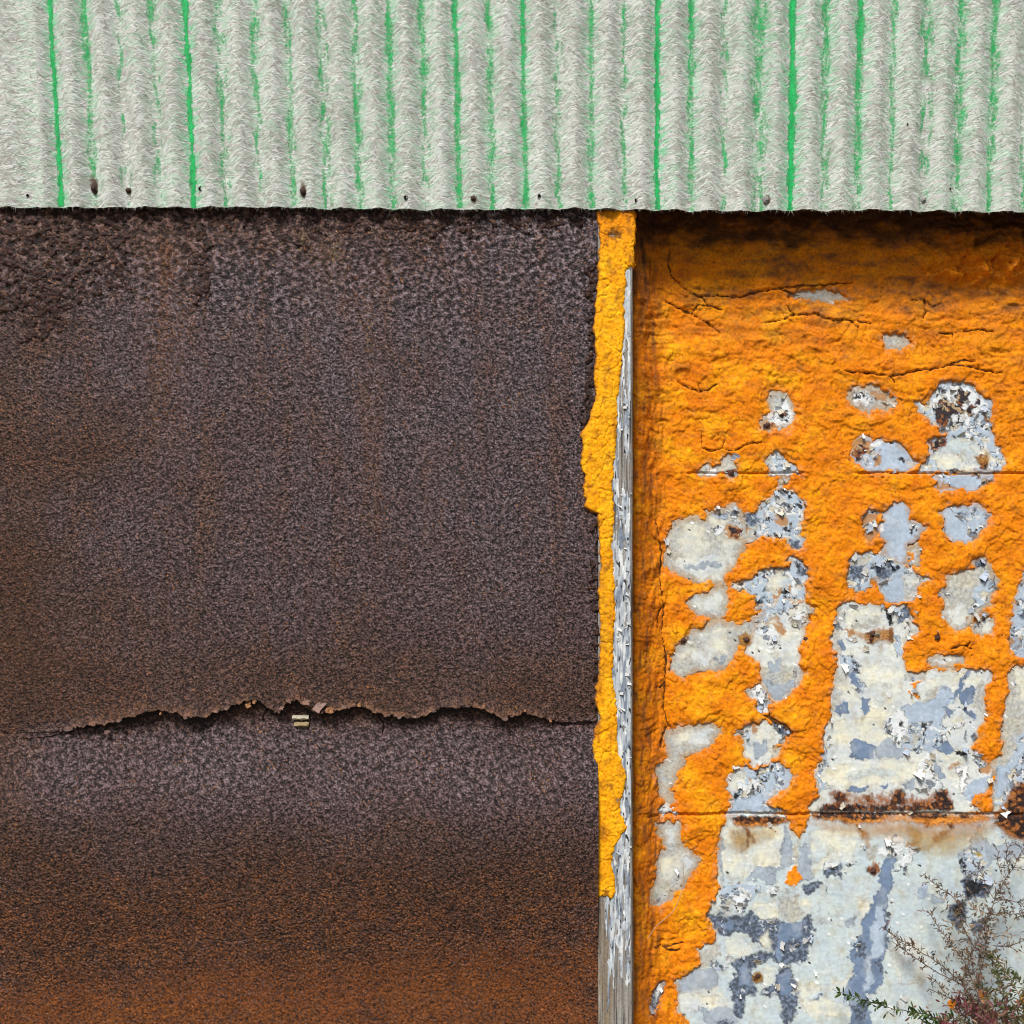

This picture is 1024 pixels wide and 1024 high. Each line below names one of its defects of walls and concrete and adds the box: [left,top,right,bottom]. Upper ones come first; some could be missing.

crack [665,252,871,331]
crack [845,299,1001,383]
peeling [759,390,797,433]
peeling [846,380,1007,545]
peeling [605,269,632,1012]
crack [8,698,597,740]
peeling [649,451,1024,1024]
corrosion [733,815,787,846]
corrosion [813,782,1024,842]
corrosion [0,948,588,1024]